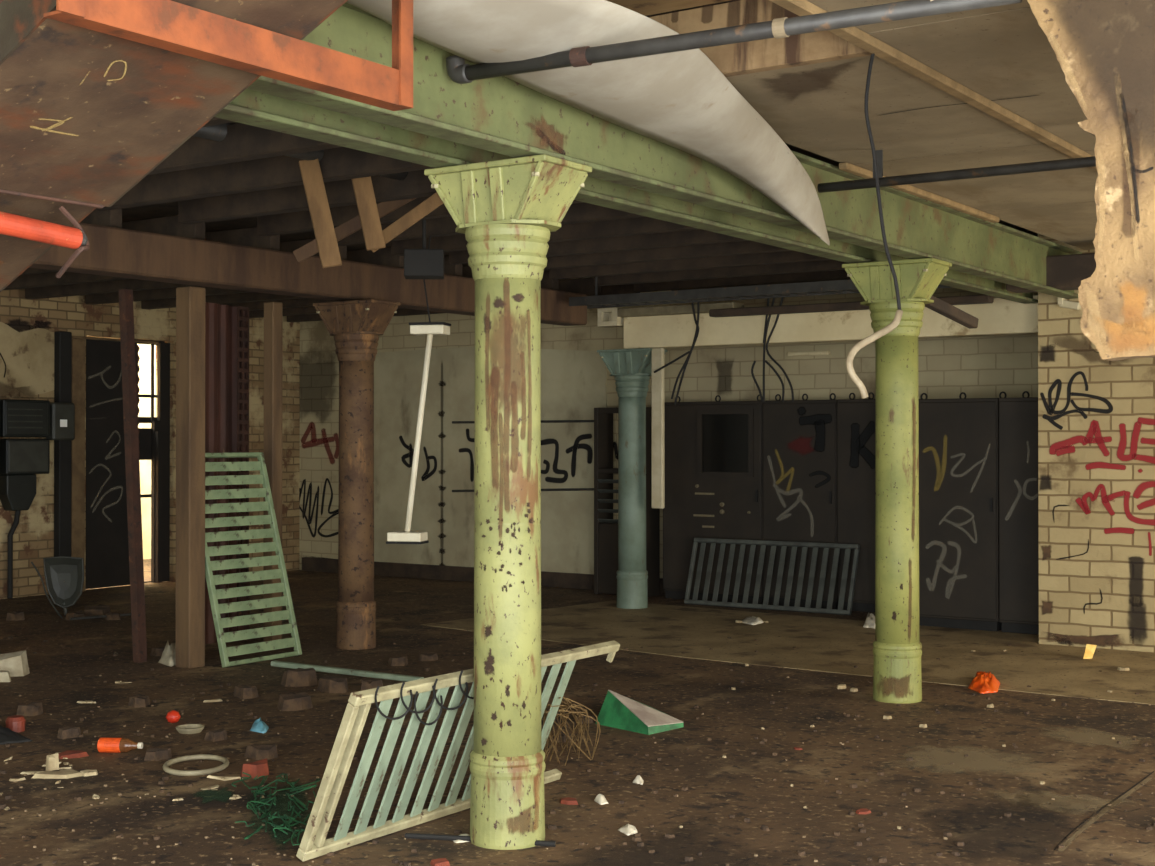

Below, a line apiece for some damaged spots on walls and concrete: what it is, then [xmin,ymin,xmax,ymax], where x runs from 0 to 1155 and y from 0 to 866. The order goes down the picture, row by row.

rust [528,119,567,155]
peeling [0,322,54,396]
spalling [1040,345,1055,362]
rust [484,280,532,537]
rust [507,808,534,833]